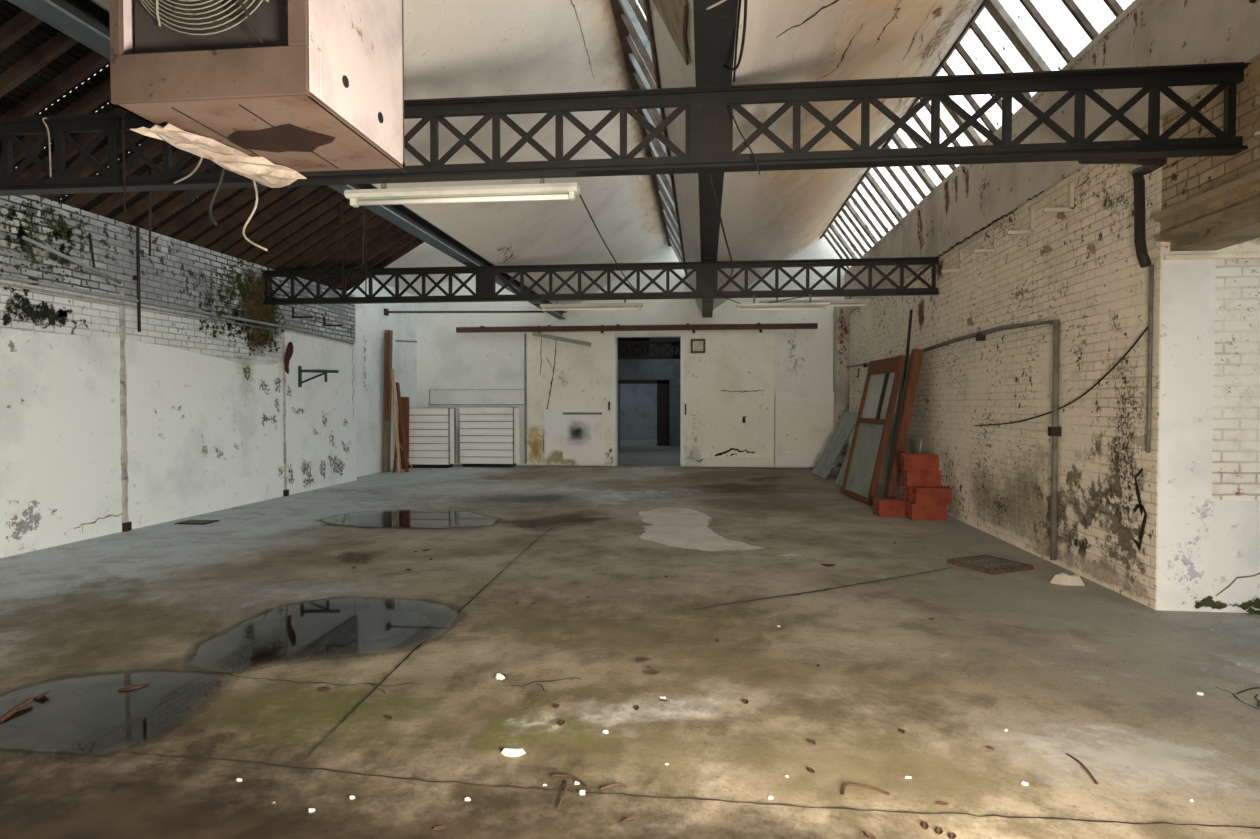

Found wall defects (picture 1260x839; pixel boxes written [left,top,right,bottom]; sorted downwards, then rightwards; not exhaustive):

peeling [243,366,305,426]
peeling [278,412,349,489]
water stain [1028,361,1146,579]
peeling [6,500,57,540]